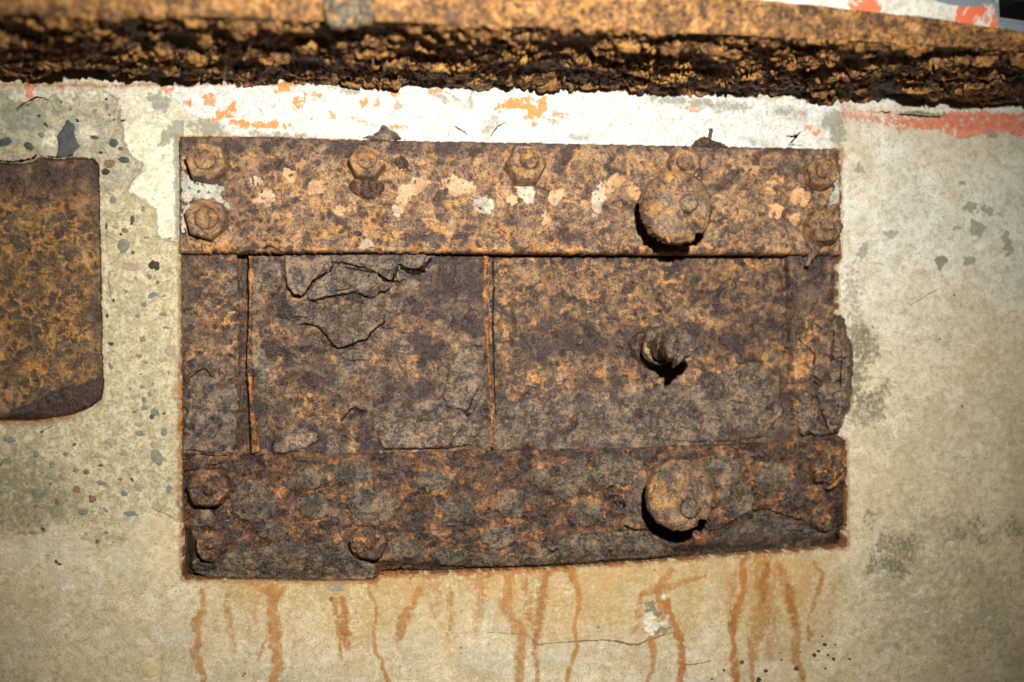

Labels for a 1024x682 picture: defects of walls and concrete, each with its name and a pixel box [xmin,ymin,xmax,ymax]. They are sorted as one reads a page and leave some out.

corrosion [323,0,375,31]
crack [285,258,433,349]
corrosion [284,254,435,362]
spalling [0,81,1024,589]
corrosion [273,431,318,454]
corrosion [378,347,485,449]
corrosion [641,362,781,443]
corrosion [809,441,848,490]
corrosion [180,513,706,682]
corrosion [728,553,812,682]
corrosion [811,562,824,612]